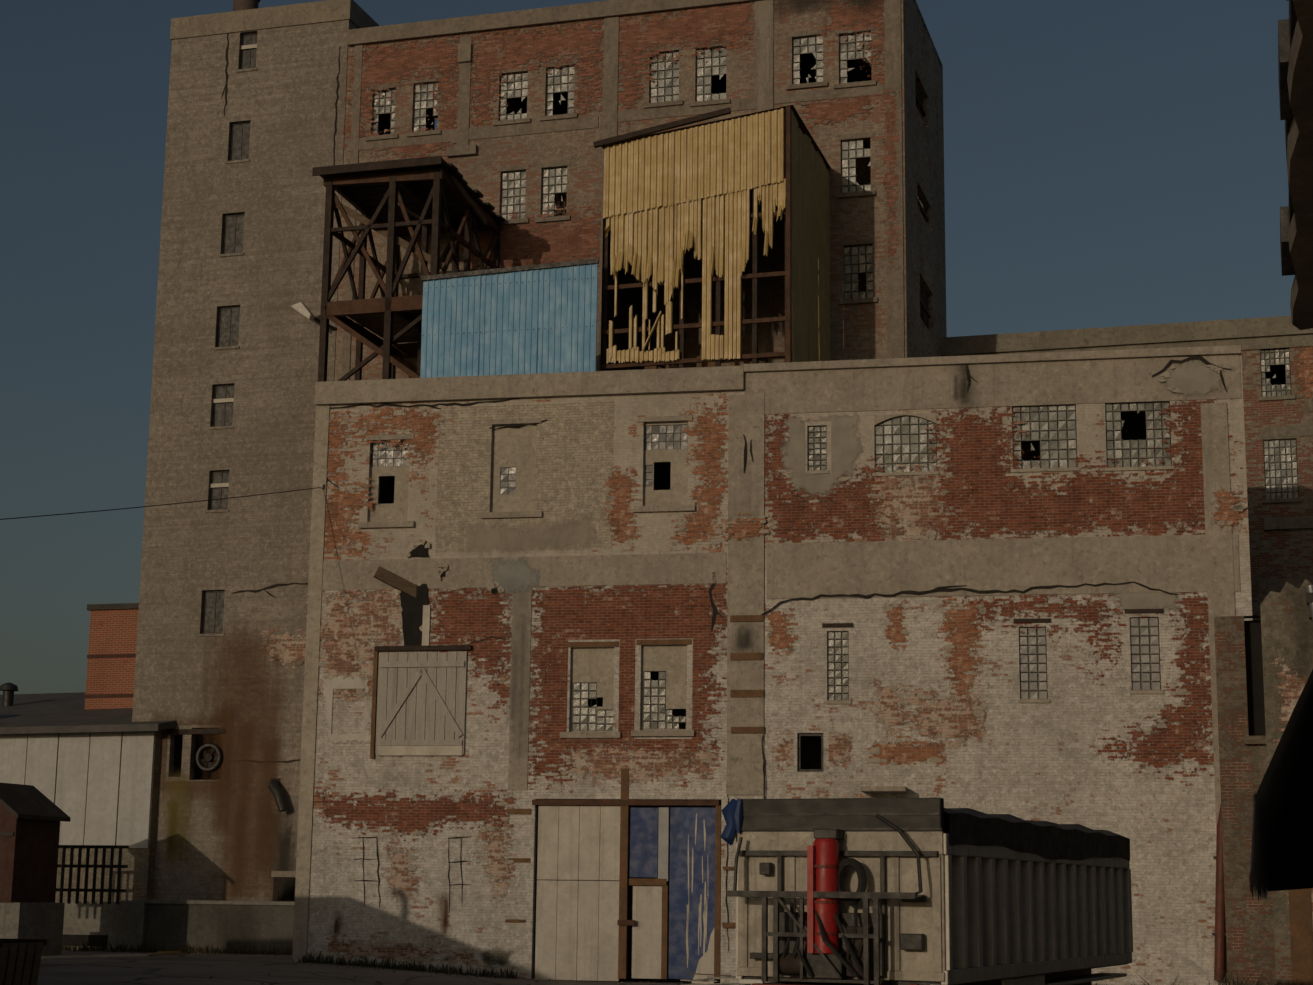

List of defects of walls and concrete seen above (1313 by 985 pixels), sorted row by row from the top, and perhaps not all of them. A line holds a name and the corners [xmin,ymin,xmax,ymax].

crack [221,34,229,116]
crack [333,46,341,166]
flaking render [303,402,460,561]
flaking render [668,360,1248,554]
crack [232,583,308,598]
flaking render [253,540,512,723]
flaking render [313,568,728,909]
crack [709,572,724,632]
crack [761,581,1179,615]
flaking render [829,594,1133,770]
flaking render [1094,592,1214,792]
flaking render [1268,658,1308,745]